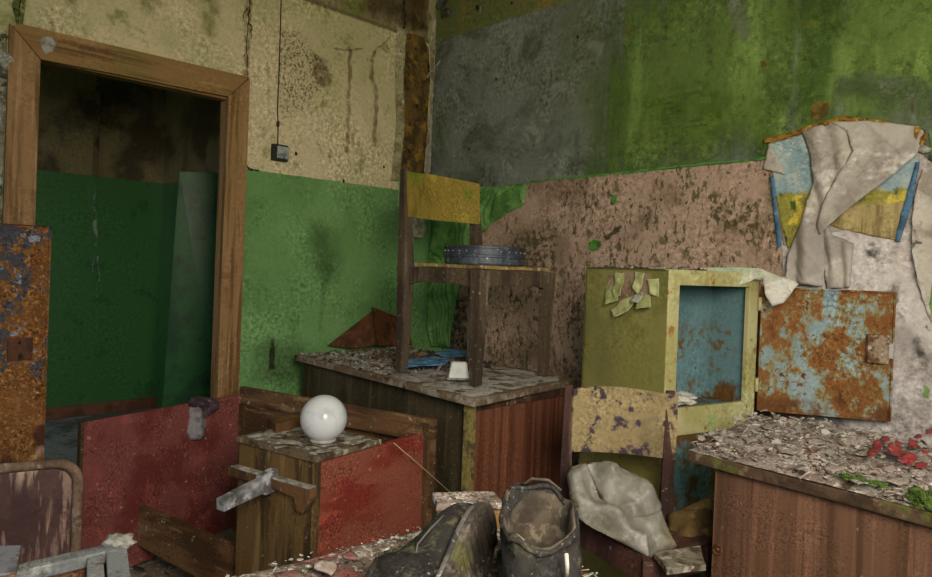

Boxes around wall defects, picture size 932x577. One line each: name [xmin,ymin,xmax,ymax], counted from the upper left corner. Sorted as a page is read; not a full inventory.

flaking render [0,31,15,223]
crack [243,0,253,75]
flaking render [391,0,453,207]
peeling [449,285,468,359]
peeling [482,157,791,388]
flaking render [754,153,932,448]